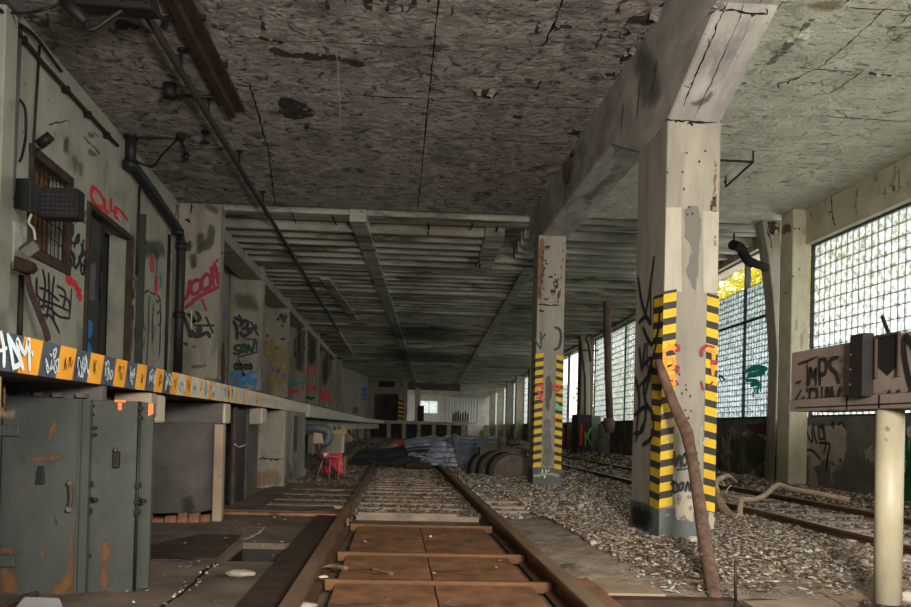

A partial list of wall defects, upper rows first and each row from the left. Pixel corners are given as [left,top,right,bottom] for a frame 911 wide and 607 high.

peeling [278,98,315,130]
crack [249,0,583,235]
crack [665,0,781,151]
crack [777,0,911,92]
corrosion [537,239,545,298]